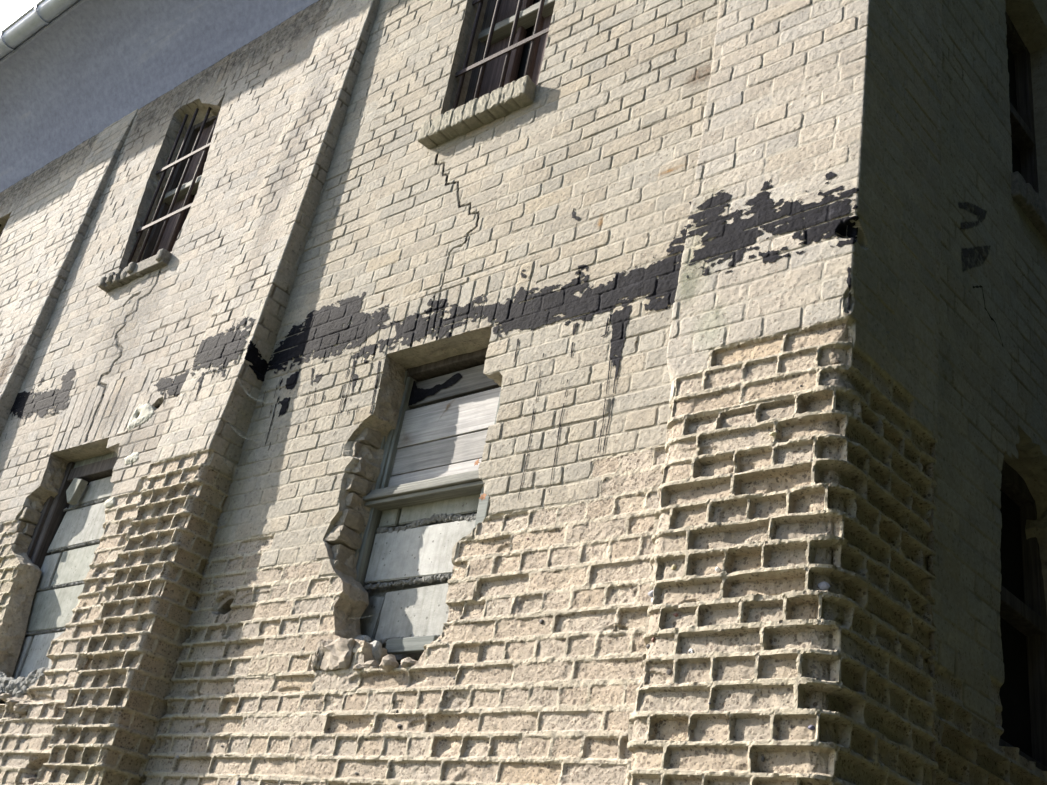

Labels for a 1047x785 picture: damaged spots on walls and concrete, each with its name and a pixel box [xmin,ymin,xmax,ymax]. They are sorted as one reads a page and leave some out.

crack [435,155,479,242]
spalling [0,318,1047,785]